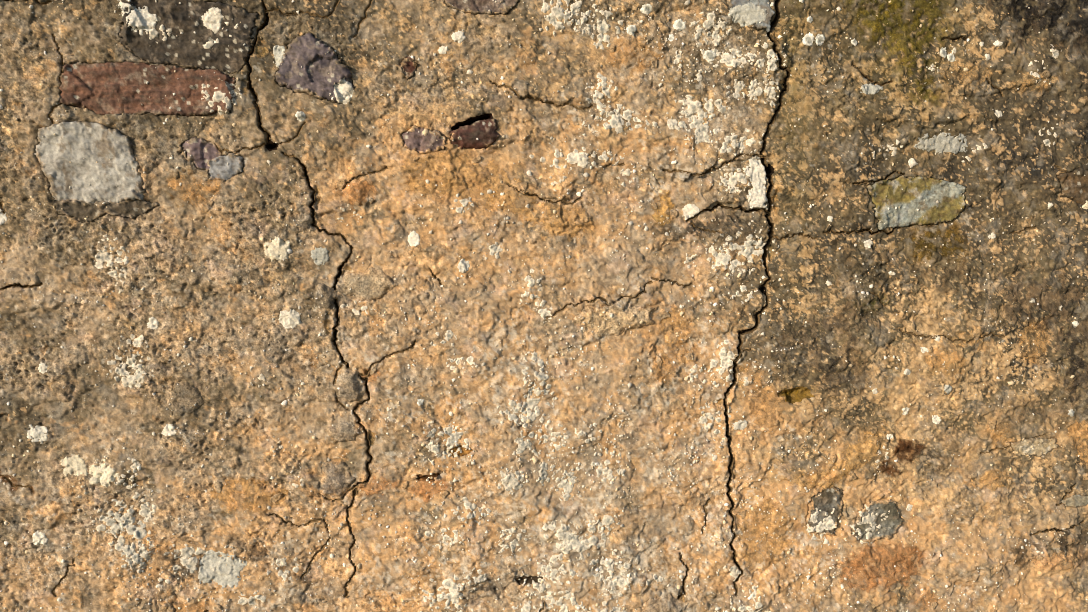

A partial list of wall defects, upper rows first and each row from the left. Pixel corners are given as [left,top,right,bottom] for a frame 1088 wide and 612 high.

crack [218,0,417,598]
crack [662,0,936,601]